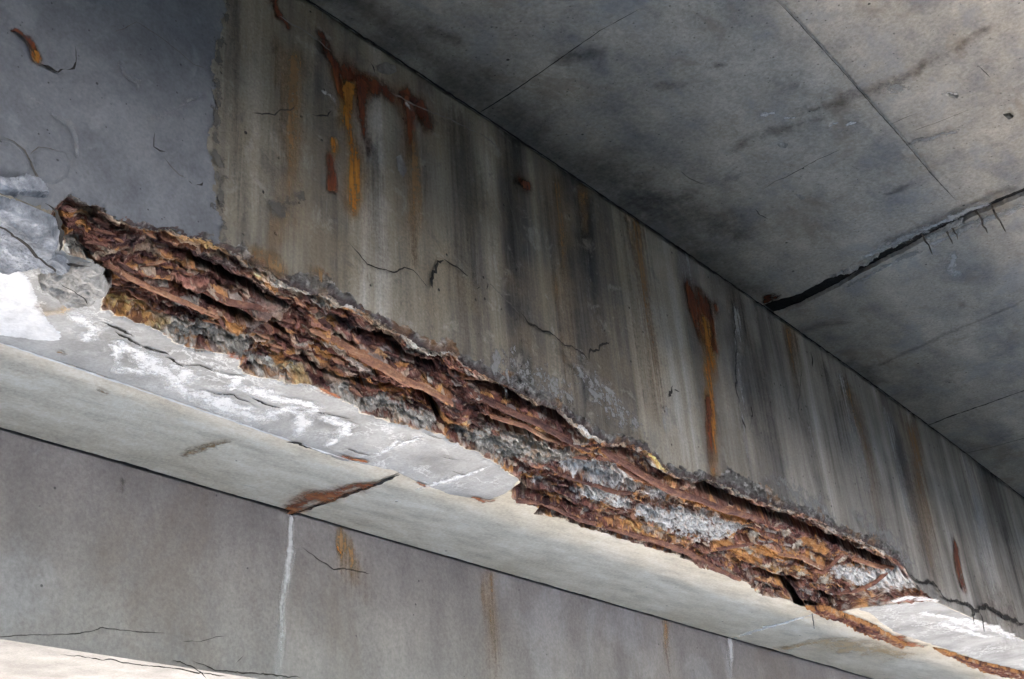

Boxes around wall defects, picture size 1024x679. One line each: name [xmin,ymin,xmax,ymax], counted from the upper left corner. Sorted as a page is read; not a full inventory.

corrosion [10,28,42,64]
corrosion [317,29,434,260]
leakage [70,316,102,342]
leakage [108,340,355,446]
crack [351,245,609,359]
spalling [51,36,936,650]
corrosion [684,277,719,474]
corrosion [285,483,374,515]
leakage [415,466,490,490]
crack [0,627,298,679]
leakage [279,516,293,650]
crack [911,575,1024,629]